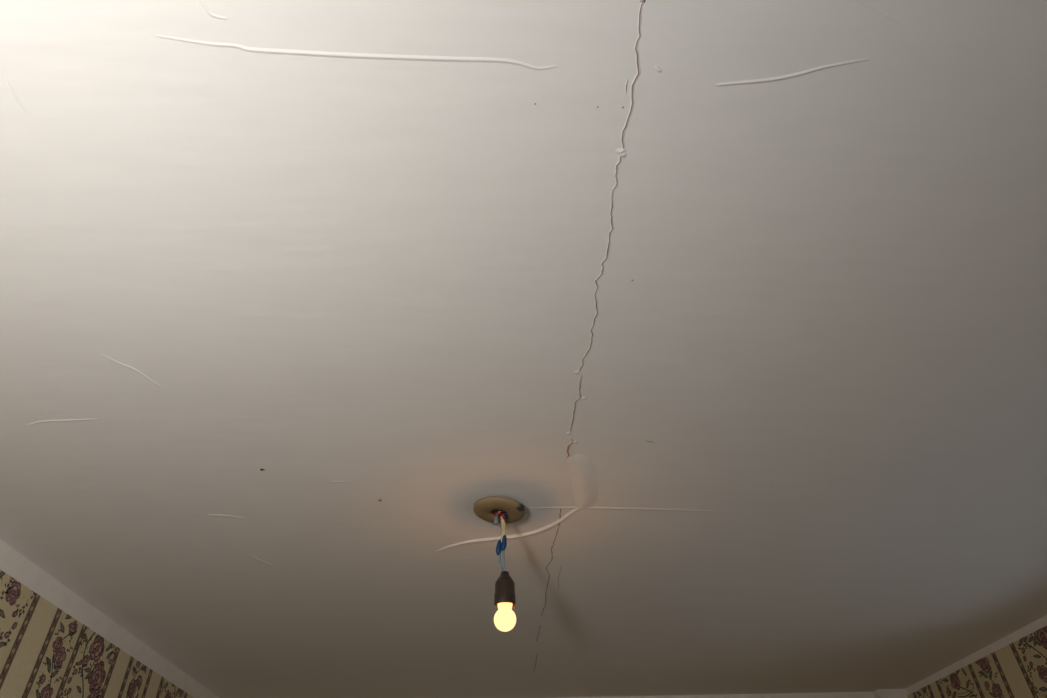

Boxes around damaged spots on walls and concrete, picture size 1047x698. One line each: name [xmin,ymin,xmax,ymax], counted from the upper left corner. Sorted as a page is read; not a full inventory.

crack [564,0,646,459]
crack [534,508,562,672]